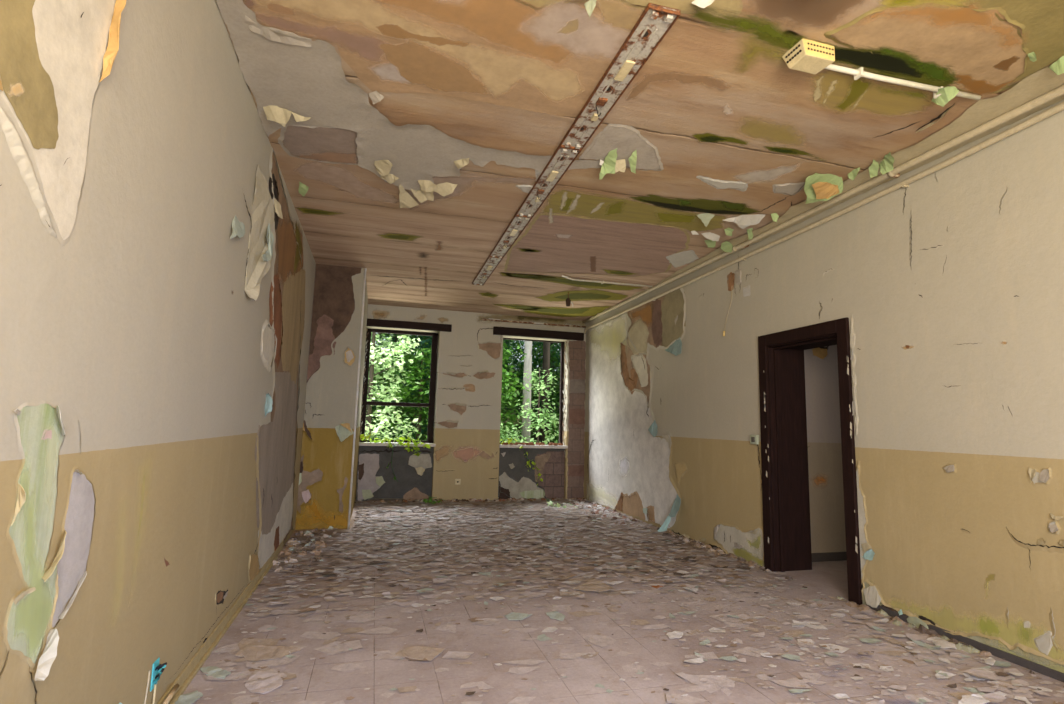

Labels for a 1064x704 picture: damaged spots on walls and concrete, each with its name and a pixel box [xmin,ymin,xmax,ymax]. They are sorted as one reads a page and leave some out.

peeling [0,0,126,245]
flaking render [216,0,613,584]
peeling [498,0,1064,532]
peeling [2,400,96,681]
peeling [700,522,769,567]
flaking render [852,459,1064,673]
crack [1006,528,1064,572]